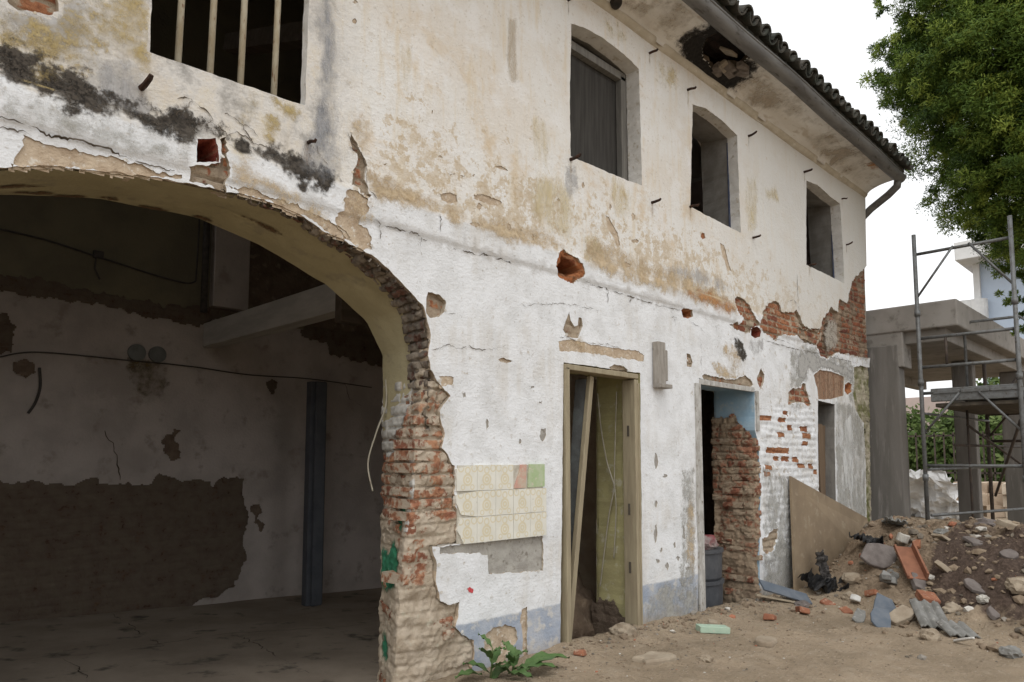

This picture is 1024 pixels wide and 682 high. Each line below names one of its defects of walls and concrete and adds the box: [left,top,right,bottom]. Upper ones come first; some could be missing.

damp [0,0,199,143]
damp [320,5,335,81]
flaking render [702,33,749,79]
damp [235,98,335,192]
damp [375,176,459,223]
flaking render [556,247,585,284]
damp [587,239,737,311]
peeling [558,314,644,373]
flaking render [0,130,544,682]
flaking render [702,269,872,604]